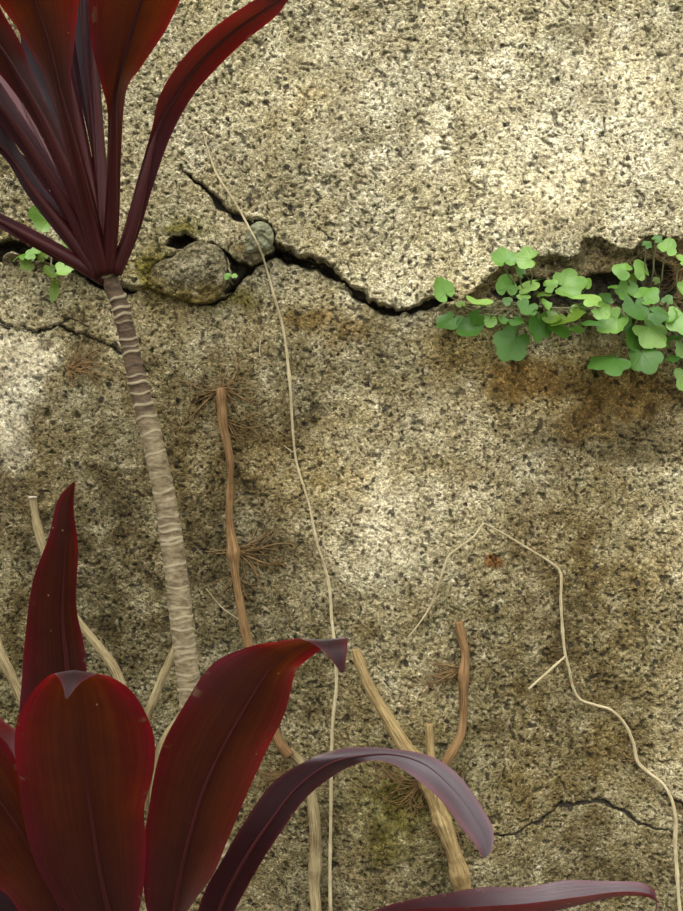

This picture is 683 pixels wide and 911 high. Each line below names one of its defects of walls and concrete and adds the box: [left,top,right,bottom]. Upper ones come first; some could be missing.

crack [184,172,456,316]
crack [46,259,137,295]
crack [0,318,122,355]
water stain [488,357,565,407]
water stain [510,369,676,465]
crack [494,799,683,837]